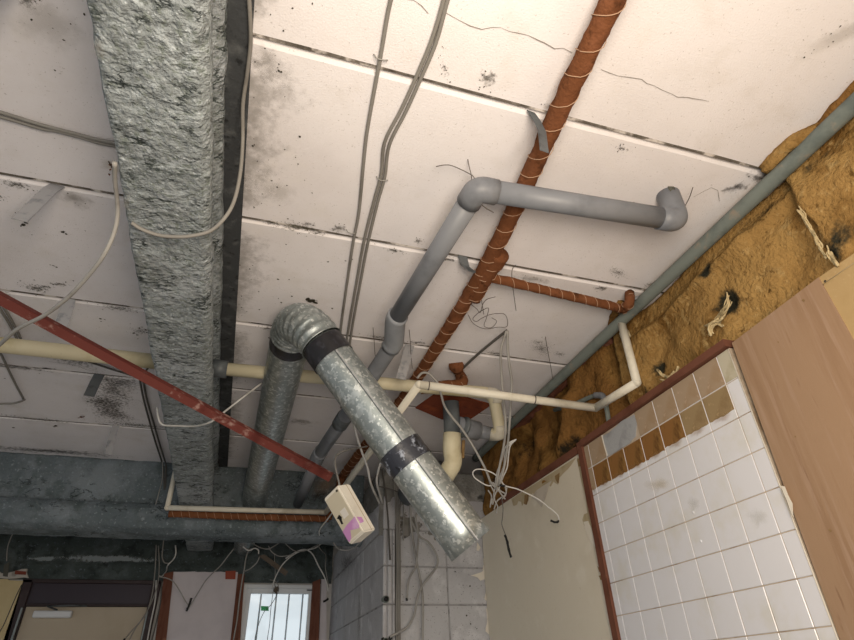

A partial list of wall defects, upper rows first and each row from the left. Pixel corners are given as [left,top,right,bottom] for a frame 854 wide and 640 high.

crack [413,0,572,53]
crack [601,69,706,101]
water stain [87,379,163,428]
peeling [601,415,637,457]